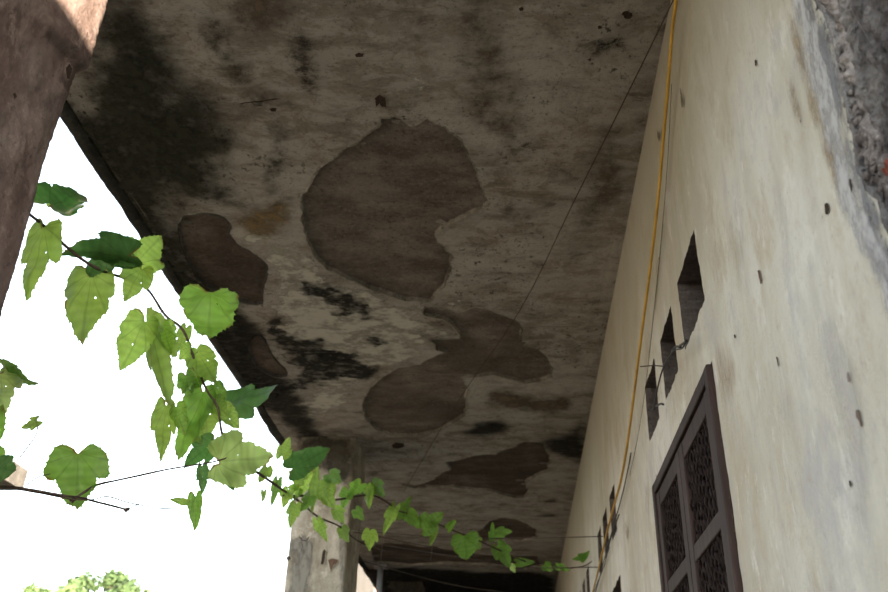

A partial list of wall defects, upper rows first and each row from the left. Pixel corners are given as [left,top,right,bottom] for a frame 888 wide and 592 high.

mould [291,37,315,92]
flaking render [814,0,888,239]
water stain [77,6,231,292]
flaking render [177,213,268,305]
flaking render [299,93,553,449]
flaking render [248,334,288,378]
water stain [215,204,447,481]
flaking render [401,441,551,498]
water stain [466,423,510,435]
water stain [491,392,570,413]
water stain [540,427,585,462]